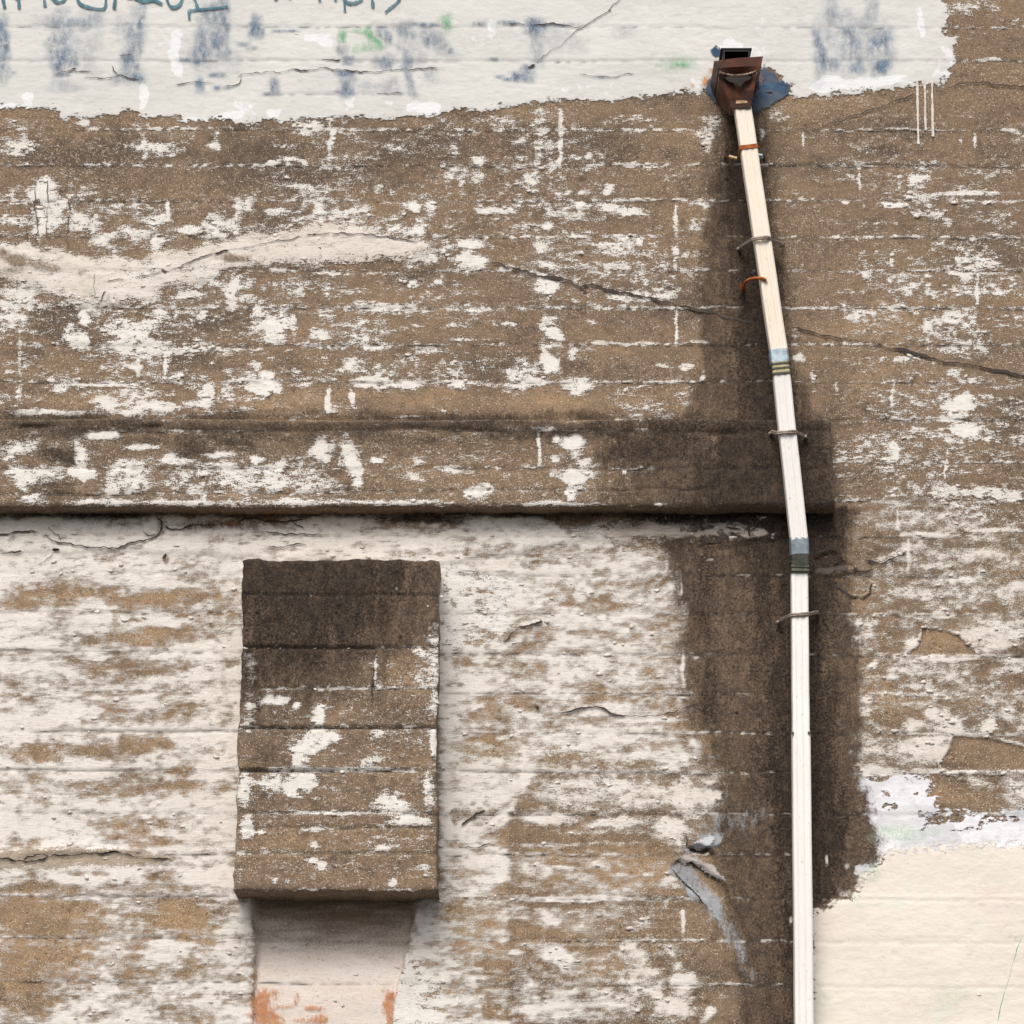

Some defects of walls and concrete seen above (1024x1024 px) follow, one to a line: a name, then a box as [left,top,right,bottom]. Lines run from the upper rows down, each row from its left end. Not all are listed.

crack [509,0,619,68]
peeling [943,0,1024,69]
crack [490,262,762,325]
crack [790,327,1024,378]
peeling [755,97,1024,825]
crack [0,515,316,565]
peeling [0,98,792,1024]
water stain [0,114,794,1024]
water stain [753,111,881,908]
peeling [813,863,877,908]
rust [249,989,328,1024]
rust [382,992,394,1024]